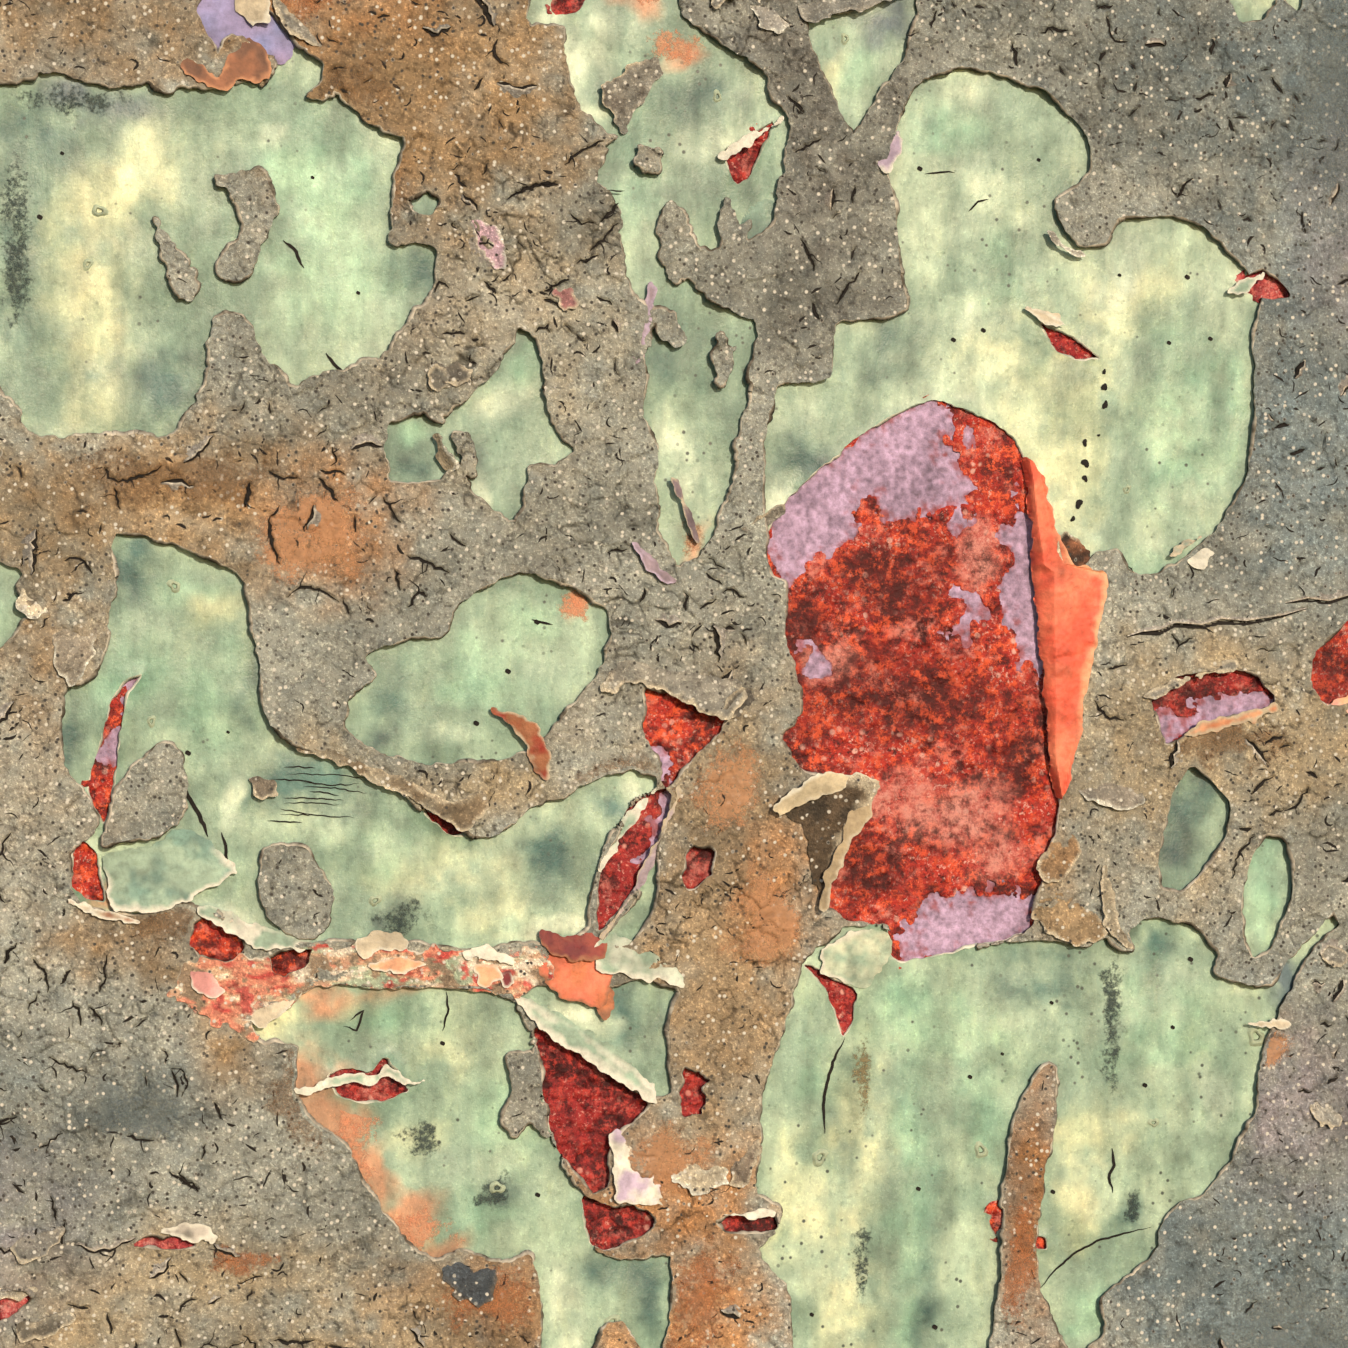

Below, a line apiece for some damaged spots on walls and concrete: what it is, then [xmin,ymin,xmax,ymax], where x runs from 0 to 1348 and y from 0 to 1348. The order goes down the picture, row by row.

crack [0,790,371,1348]
peeling [0,0,438,438]
crack [0,353,466,629]
peeling [52,534,685,1348]
rust [545,0,585,15]
rust [597,660,759,940]
crack [649,853,808,1029]
rust [706,1208,778,1232]
rust [742,394,1108,969]
peeling [671,834,1348,1348]
peeling [764,69,1260,574]
crack [906,0,1348,882]